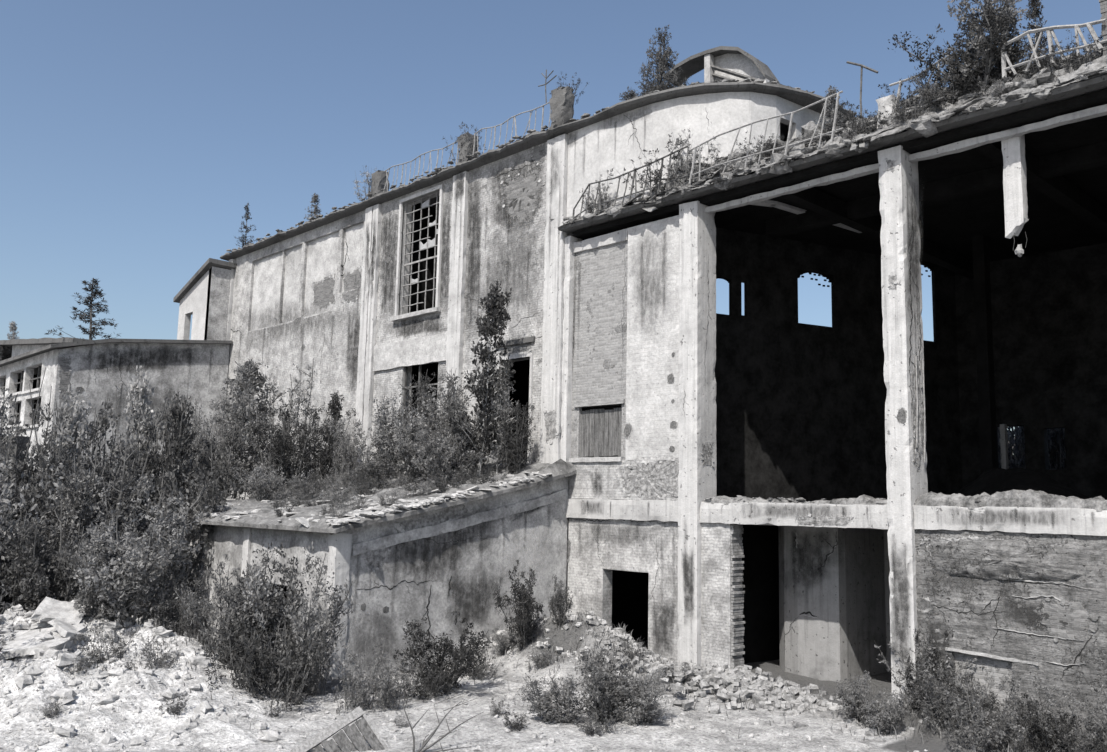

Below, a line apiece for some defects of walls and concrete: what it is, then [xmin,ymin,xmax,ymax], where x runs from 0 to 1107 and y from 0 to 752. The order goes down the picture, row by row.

water stain [494,159,541,226]
spalling [311,266,362,309]
spalling [616,455,679,501]
water stain [389,522,483,574]
crack [357,576,453,654]
water stain [449,581,490,633]
crack [931,576,1092,680]